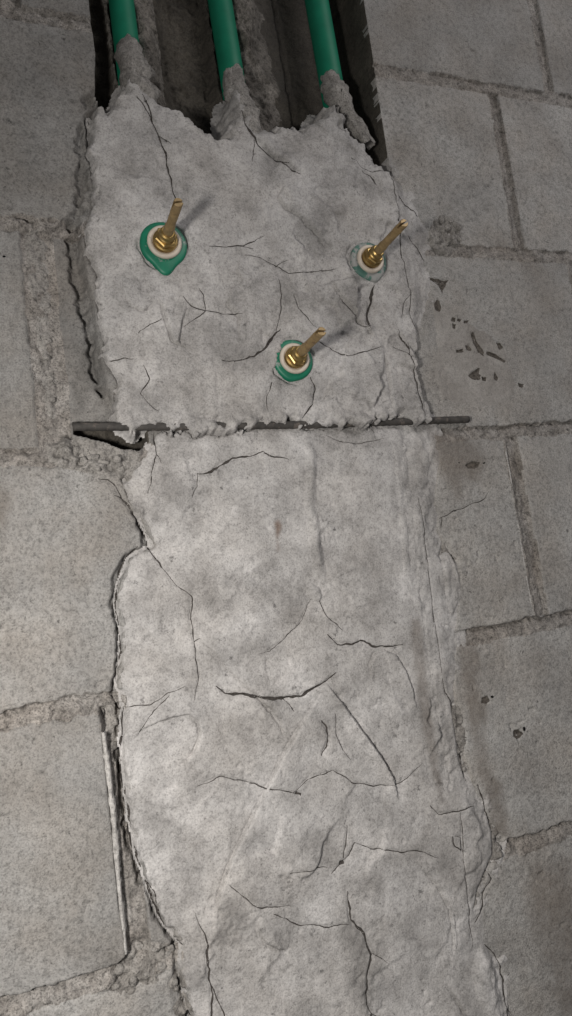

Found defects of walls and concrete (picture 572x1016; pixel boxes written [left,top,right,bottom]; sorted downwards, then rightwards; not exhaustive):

crack [137,94,176,198]
crack [241,110,300,174]
crack [183,289,243,326]
crack [211,157,425,412]
peeling [429,275,448,312]
peeling [451,317,505,363]
peeling [469,368,498,381]
crack [261,599,403,654]
crack [418,493,488,703]
crack [101,358,336,1016]
crack [198,714,418,796]
crack [230,737,512,1016]